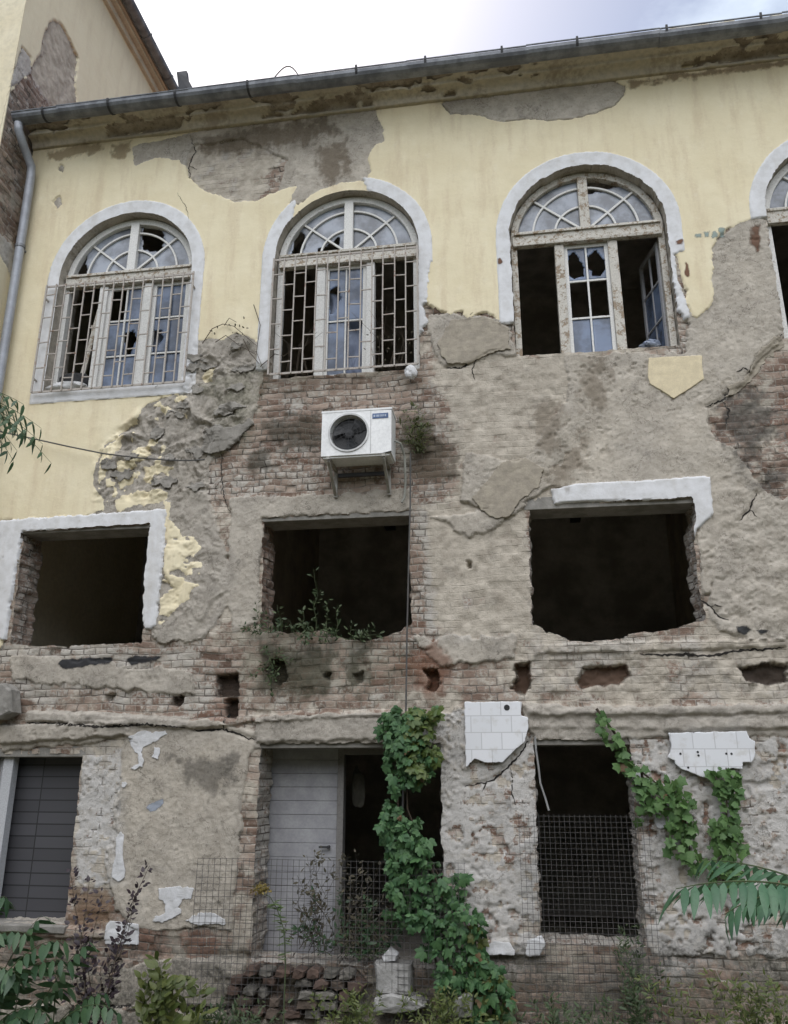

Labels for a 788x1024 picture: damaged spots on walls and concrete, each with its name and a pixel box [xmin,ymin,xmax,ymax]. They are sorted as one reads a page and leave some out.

spalling [681,33,788,67]
spalling [0,21,77,277]
spalling [104,62,625,205]
crack [707,358,756,425]
crack [741,493,757,520]
spalling [0,218,788,1024]
crack [640,647,784,657]
crack [466,736,531,805]